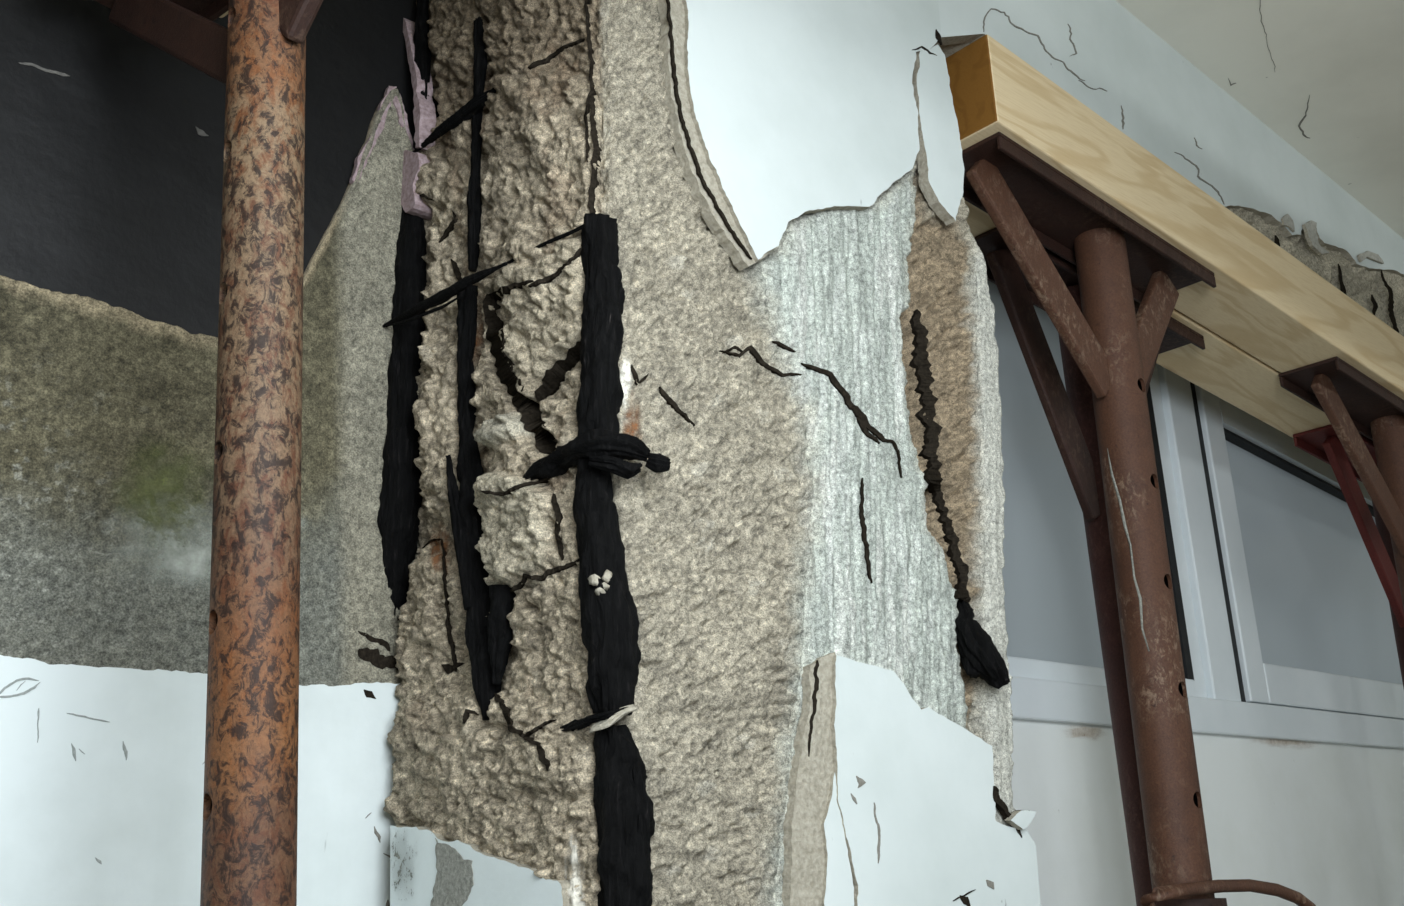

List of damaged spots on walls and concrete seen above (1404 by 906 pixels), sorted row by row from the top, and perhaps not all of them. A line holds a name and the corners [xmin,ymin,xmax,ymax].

crack [528,0,602,213]
crack [666,0,752,260]
spalling [1229,208,1404,336]
flaking render [0,275,218,674]
water stain [154,533,212,578]
crack [419,193,582,594]
spalling [299,0,994,906]
crack [630,364,695,427]
crack [719,309,971,603]
peeling [0,681,40,698]
crack [462,693,557,771]
flaking render [1004,810,1036,830]